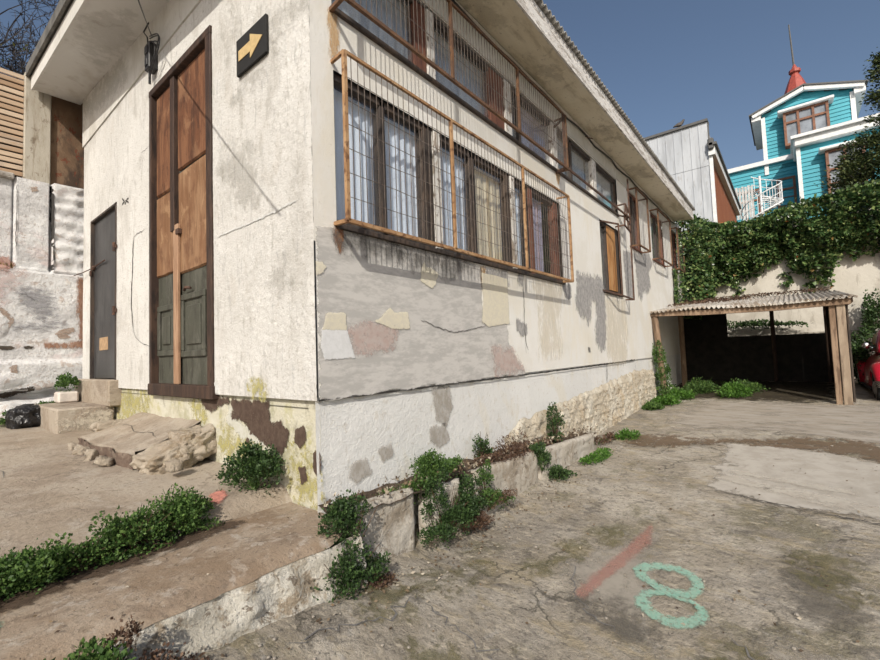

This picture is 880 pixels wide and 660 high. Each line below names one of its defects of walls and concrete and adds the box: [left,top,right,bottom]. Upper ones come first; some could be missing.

rust [327,11,339,57]
rust [333,226,344,253]
flaking render [0,256,15,272]
flaking render [44,327,83,349]
flaking render [316,226,526,448]
peeling [201,382,306,455]
flaking render [378,444,393,461]
peeling [298,450,321,485]
flaking render [349,459,372,483]